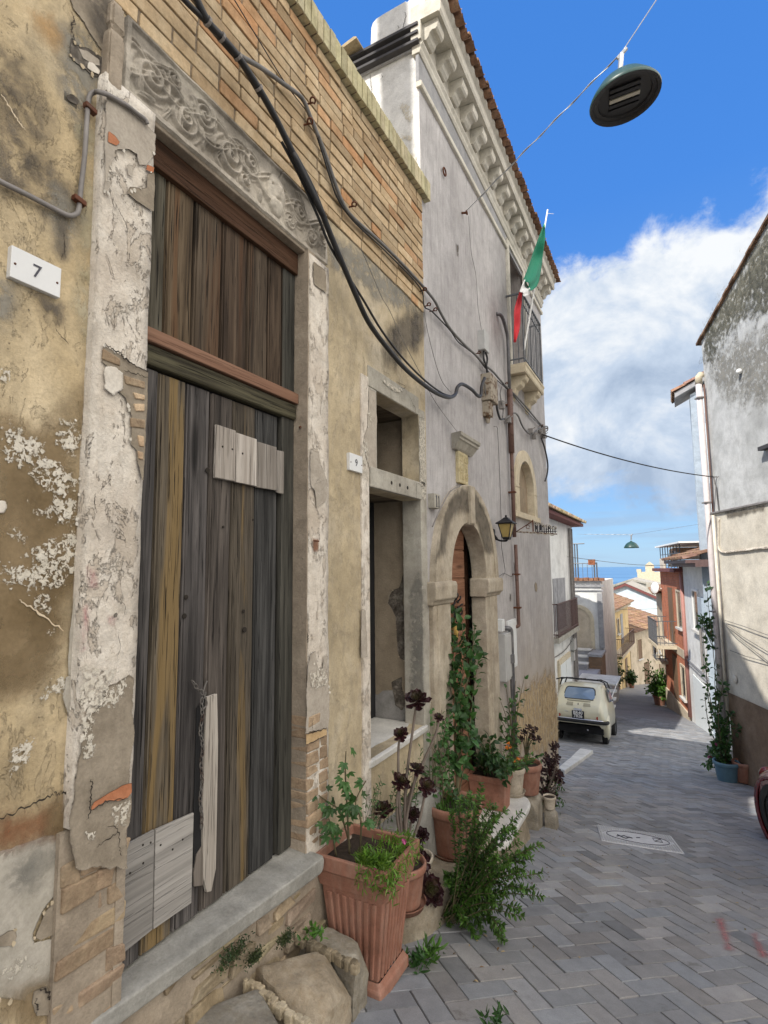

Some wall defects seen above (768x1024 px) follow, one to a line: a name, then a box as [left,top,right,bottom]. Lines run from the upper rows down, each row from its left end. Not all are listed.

spalling [69,0,115,78]
damp [0,59,24,187]
peeling [103,97,156,211]
damp [52,183,93,255]
damp [327,235,425,368]
spalling [102,343,148,480]
peeling [0,419,83,616]
spalling [388,576,405,661]
peeling [9,738,35,778]
peeling [39,597,135,871]
crack [0,780,124,856]
spalling [0,928,17,947]